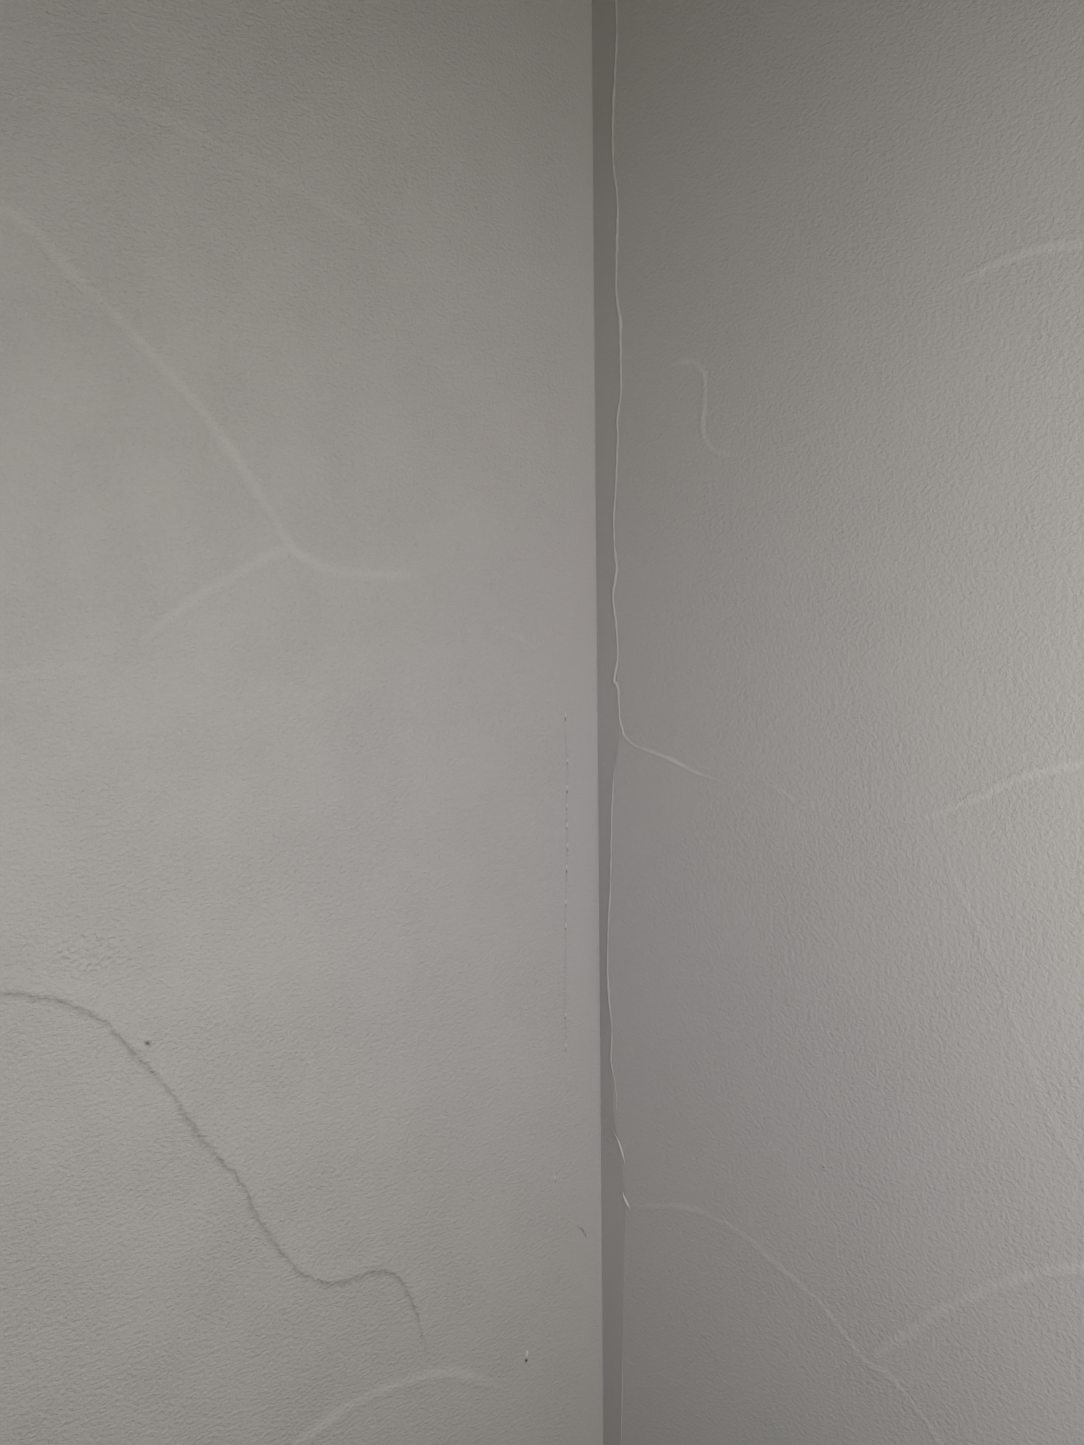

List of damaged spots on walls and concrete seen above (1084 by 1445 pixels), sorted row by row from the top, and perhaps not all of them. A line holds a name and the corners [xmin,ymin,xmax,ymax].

crack [606,0,811,1212]